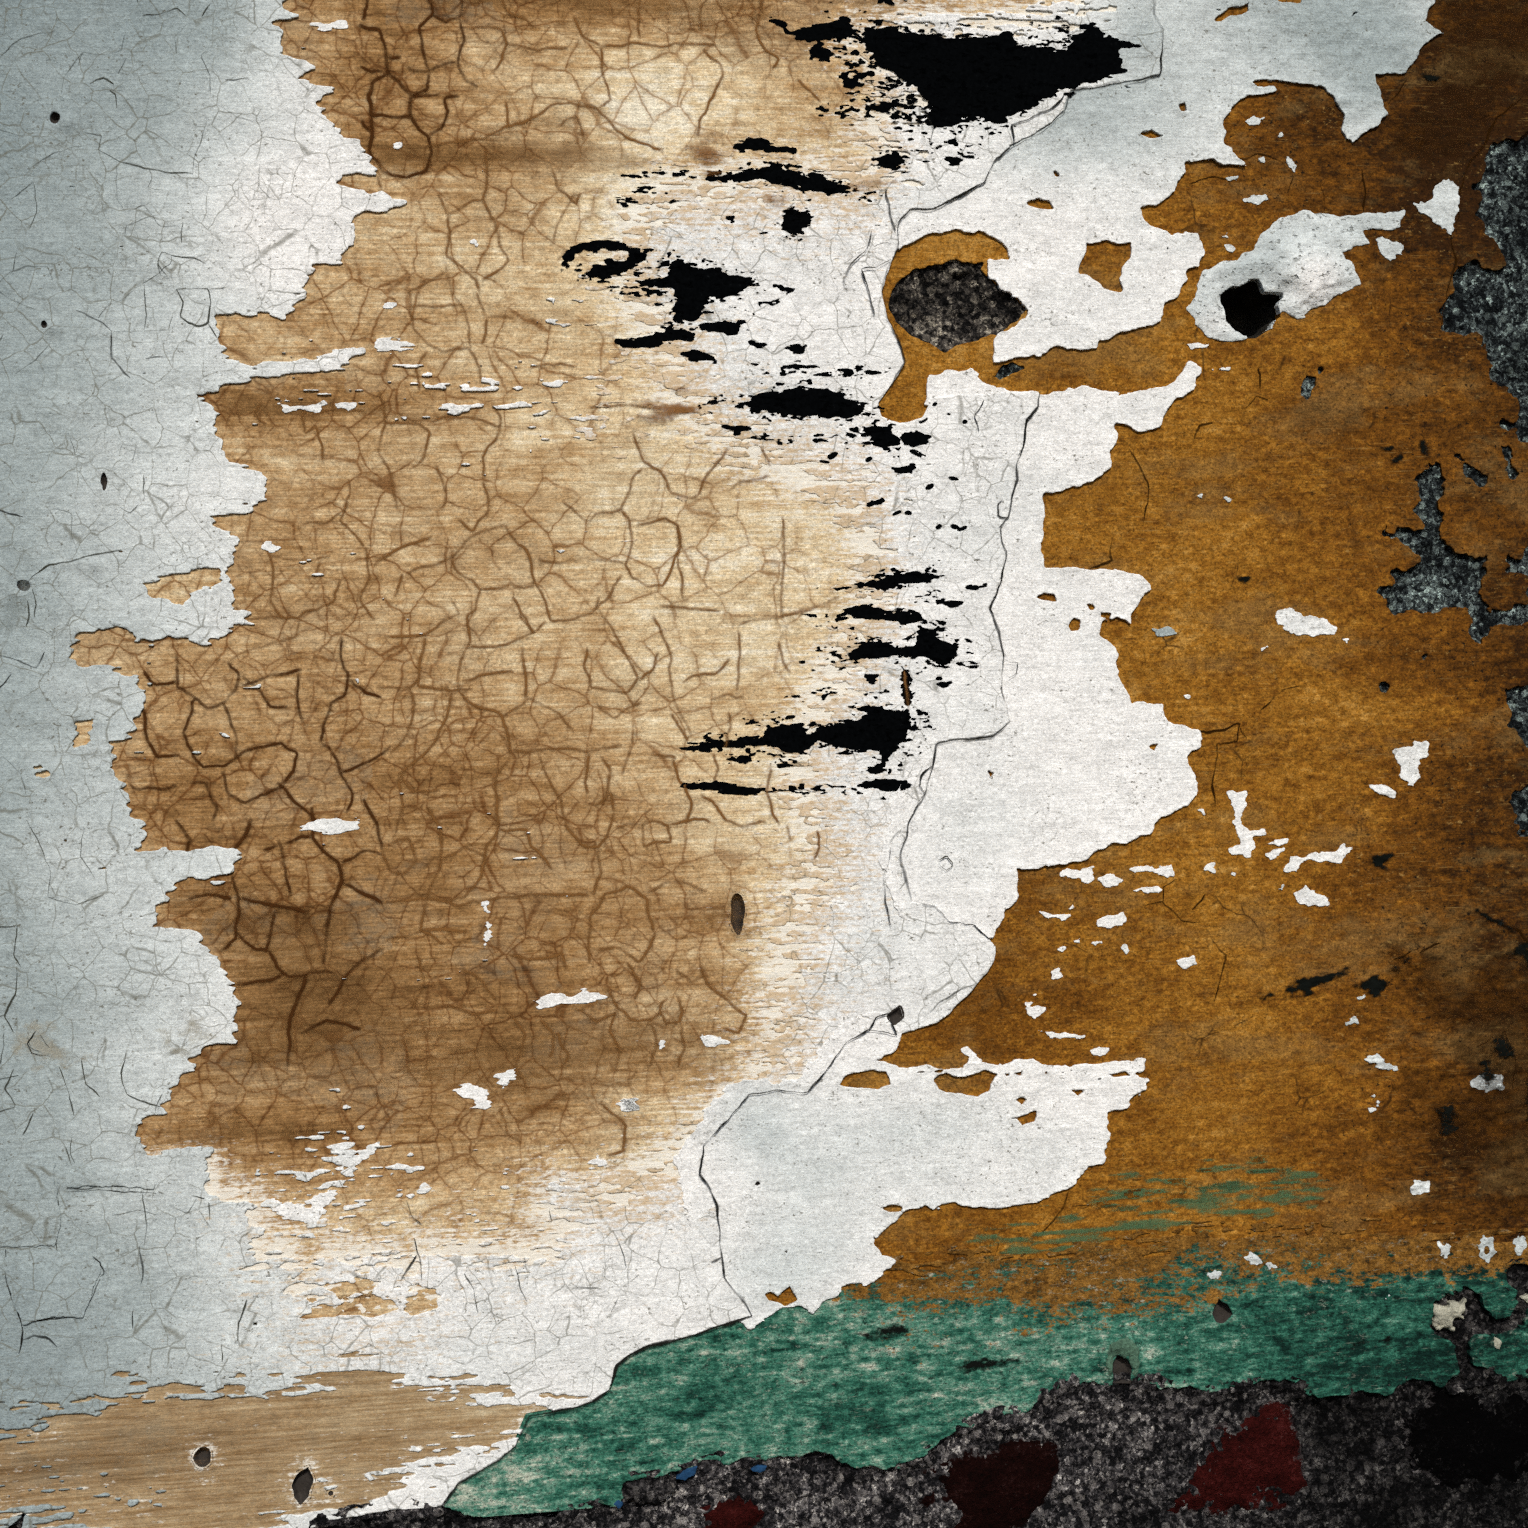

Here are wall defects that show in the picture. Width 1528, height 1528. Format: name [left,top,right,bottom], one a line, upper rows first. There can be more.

crack [0,30,226,375]
crack [755,0,820,101]
crack [846,42,1163,400]
peeling [33,765,50,778]
crack [131,0,778,1085]
peeling [65,0,1117,1322]
crack [813,832,821,858]
crack [884,391,1041,939]
crack [1088,552,1113,569]
crack [1145,880,1226,1001]
peeling [873,0,1528,1283]
spalling [0,1252,1528,1528]